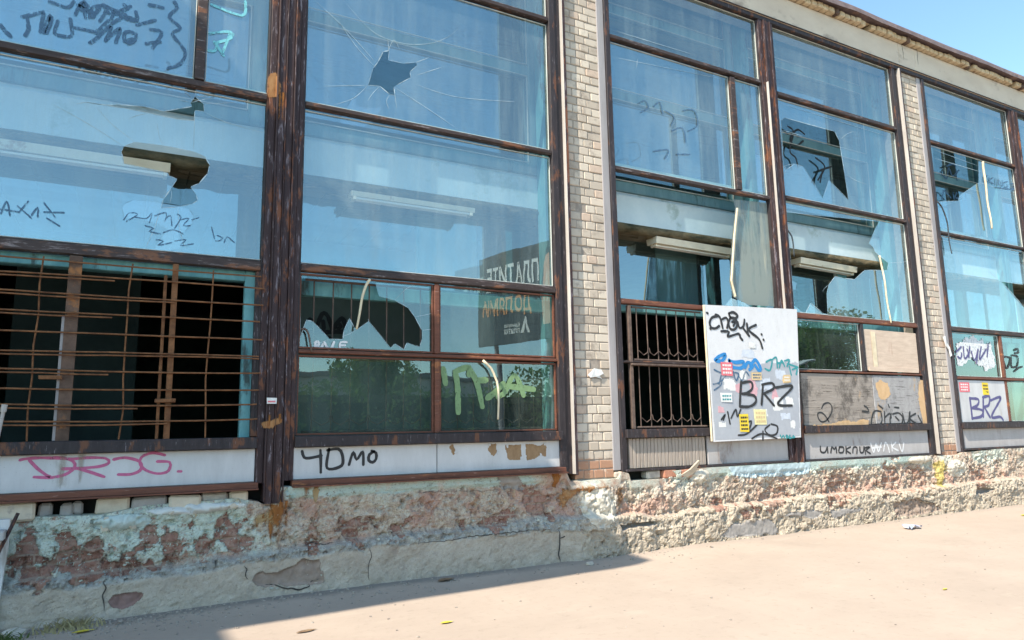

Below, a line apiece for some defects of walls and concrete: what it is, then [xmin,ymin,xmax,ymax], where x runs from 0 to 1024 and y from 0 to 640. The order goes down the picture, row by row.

corrosion [261,414,282,429]
peeling [488,443,547,461]
corrosion [552,474,623,507]
flaking render [681,460,700,477]
peeling [709,462,810,519]
spalling [819,471,861,508]
spalling [876,457,942,517]
spalling [969,465,994,490]
corrosion [255,499,288,539]
spalling [5,512,254,595]
spalling [252,512,413,590]
crack [424,529,565,562]